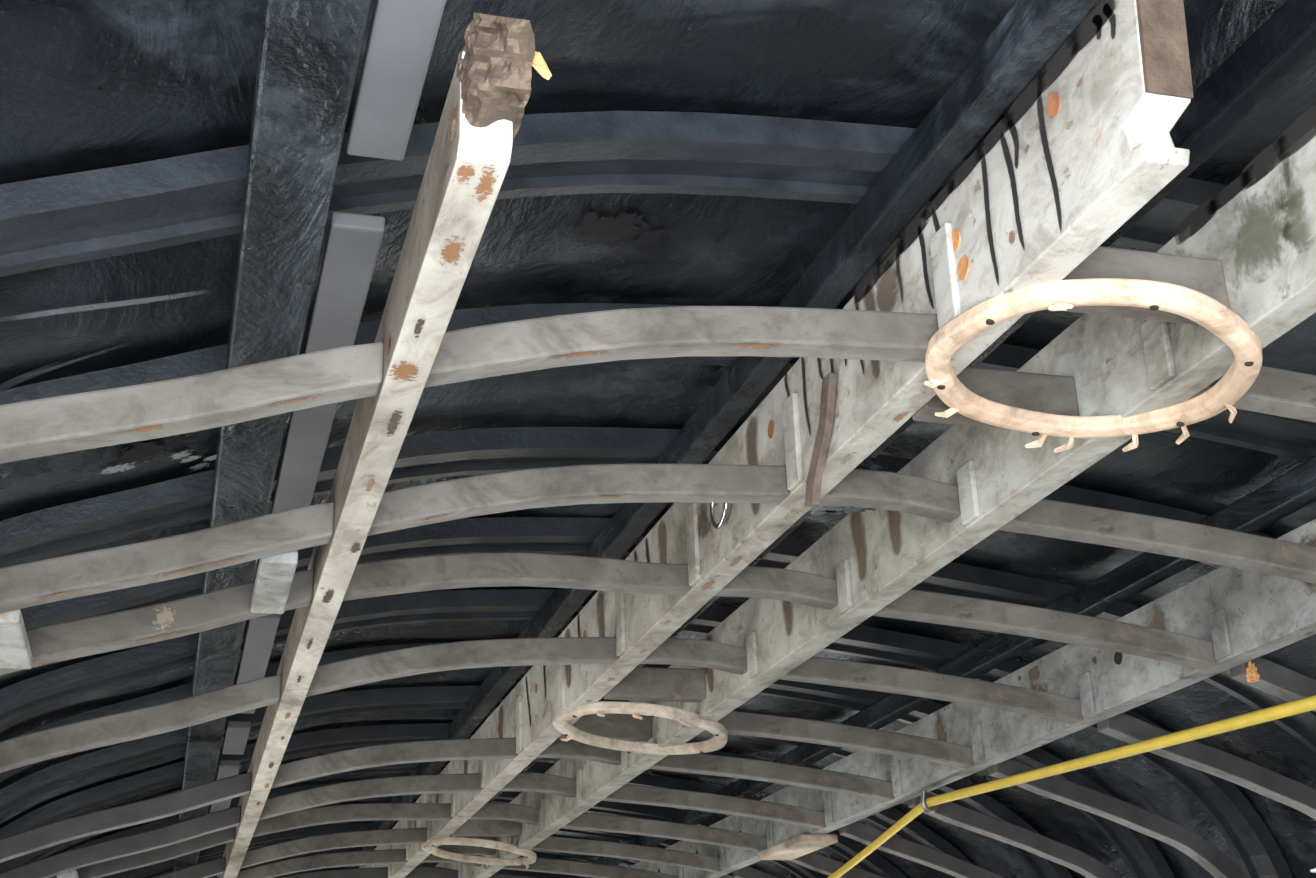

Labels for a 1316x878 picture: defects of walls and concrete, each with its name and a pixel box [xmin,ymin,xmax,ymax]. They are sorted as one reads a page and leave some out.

corrosion [453,165,499,202]
leakage [1175,104,1316,274]
corrosion [440,236,466,265]
corrosion [385,338,419,382]